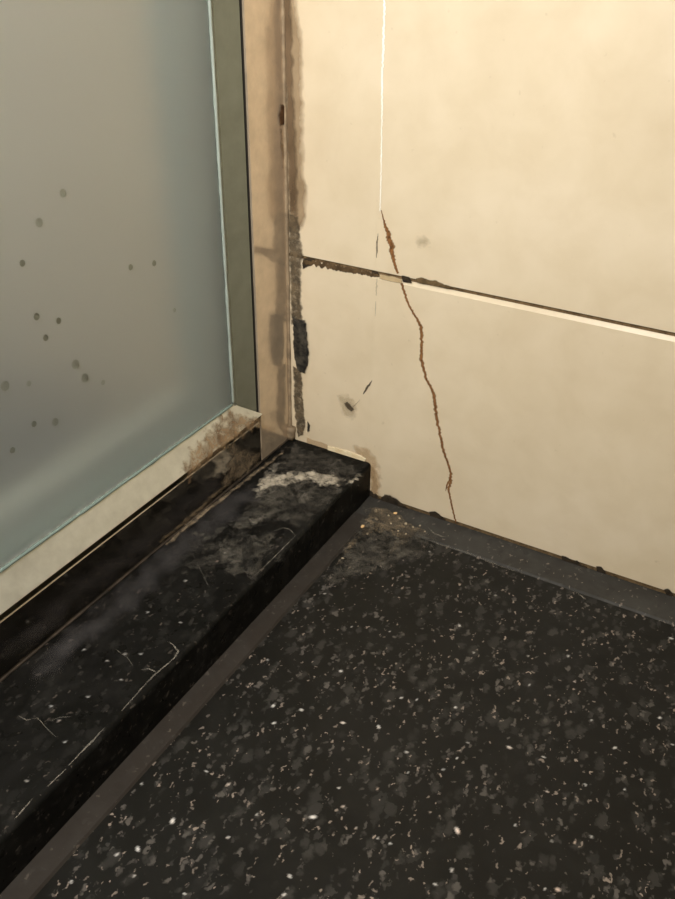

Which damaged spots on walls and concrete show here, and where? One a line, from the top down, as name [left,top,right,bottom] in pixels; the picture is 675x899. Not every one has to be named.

water stain [284,0,310,437]
crack [381,210,456,522]